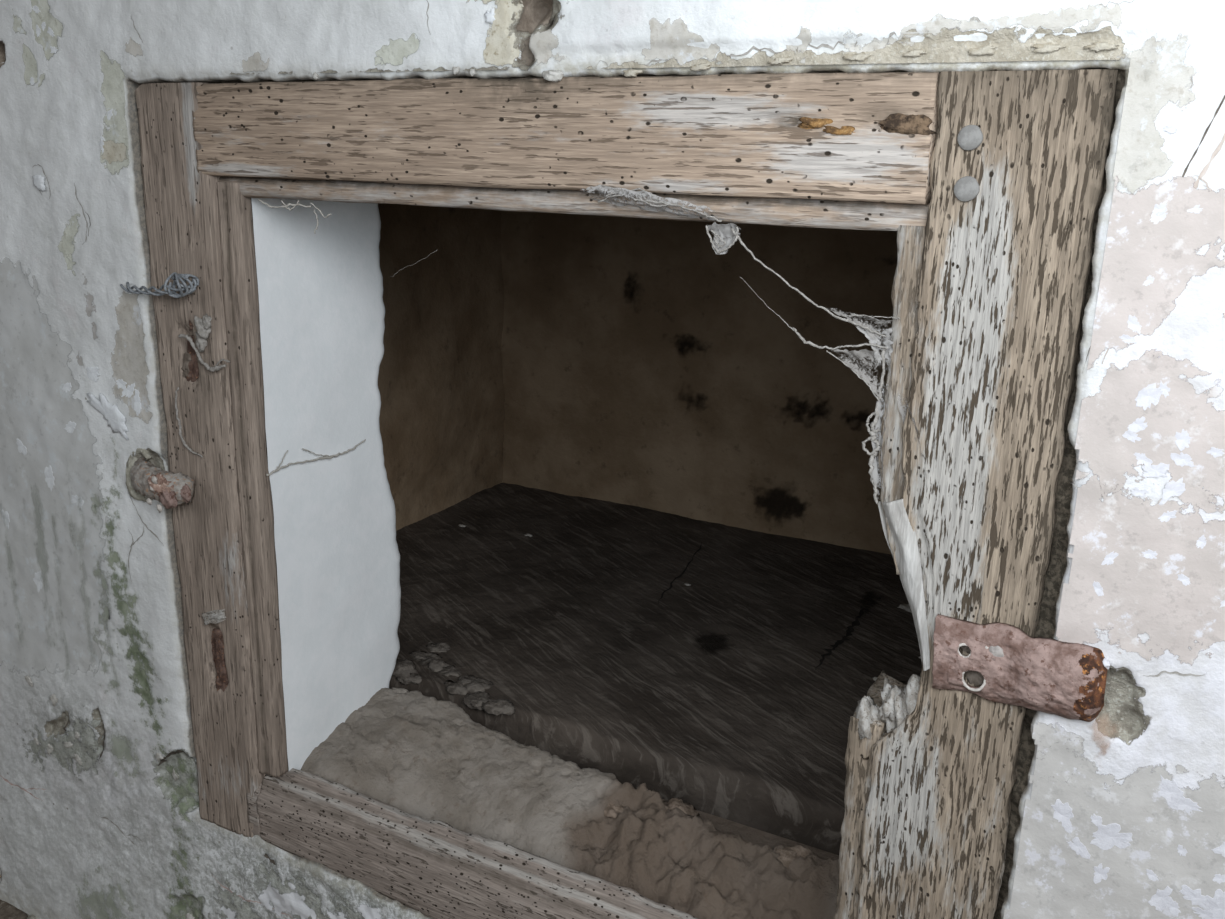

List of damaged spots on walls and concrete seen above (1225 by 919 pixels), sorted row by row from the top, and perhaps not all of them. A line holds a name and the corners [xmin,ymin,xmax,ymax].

peeling [13,0,63,87]
crack [1182,95,1225,177]
peeling [58,214,98,340]
peeling [587,1,1225,745]
peeling [0,257,153,687]
spalling [126,448,165,512]
leakage [32,494,54,580]
spalling [22,694,105,781]
peeling [1003,737,1225,919]